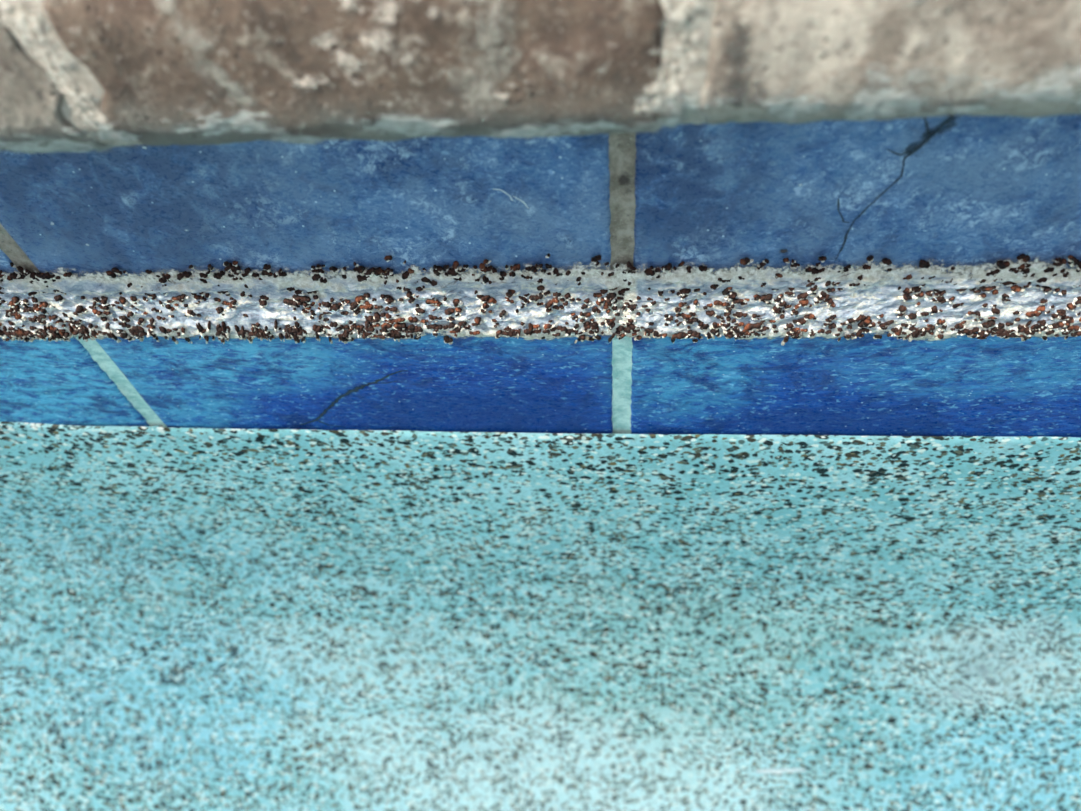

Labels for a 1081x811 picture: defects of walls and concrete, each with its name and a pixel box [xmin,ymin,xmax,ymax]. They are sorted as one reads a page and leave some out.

crack [837,115,963,253]